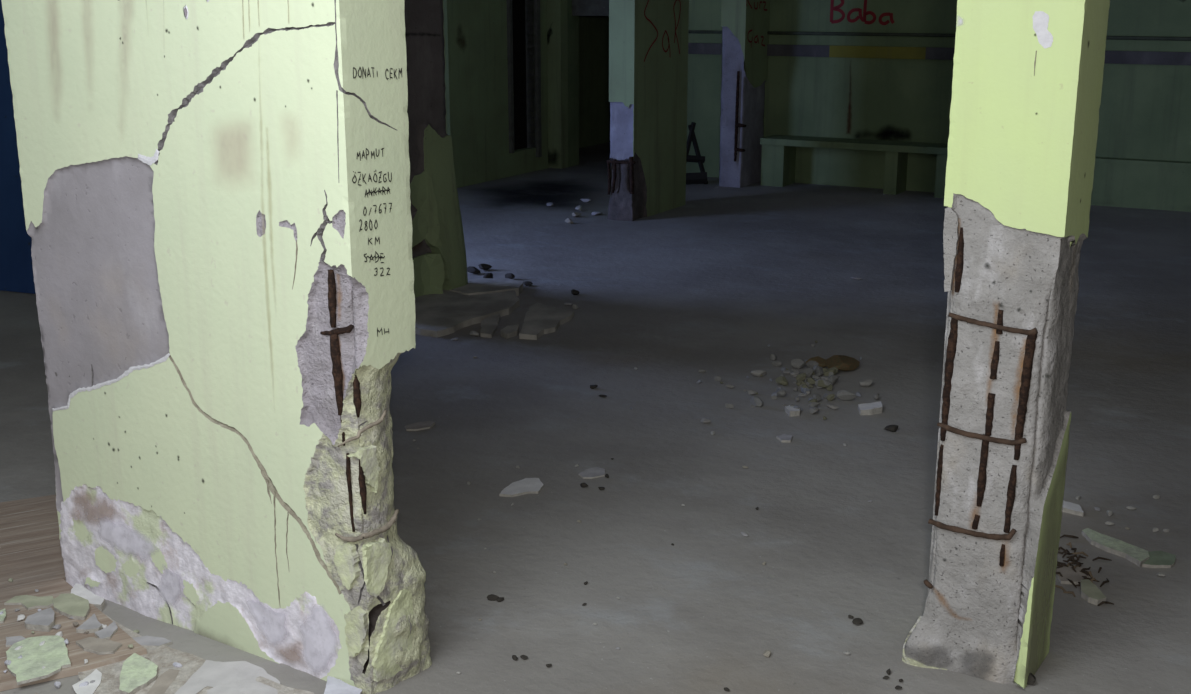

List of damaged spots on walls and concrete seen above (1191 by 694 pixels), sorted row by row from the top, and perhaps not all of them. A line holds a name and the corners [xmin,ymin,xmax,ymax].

spalling [902,193,1088,690]